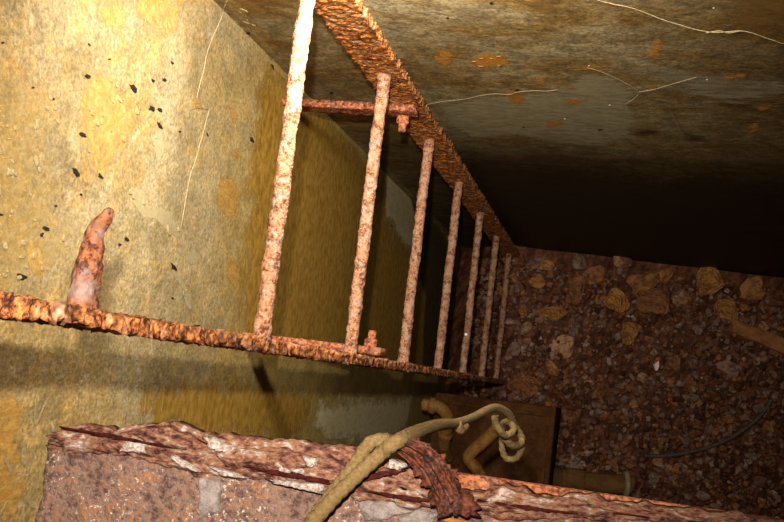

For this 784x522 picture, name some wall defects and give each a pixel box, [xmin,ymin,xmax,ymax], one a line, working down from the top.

crack [598,0,784,44]
rust [471,52,508,68]
rust [0,393,46,518]
rust [45,396,358,520]
rust [348,457,784,522]